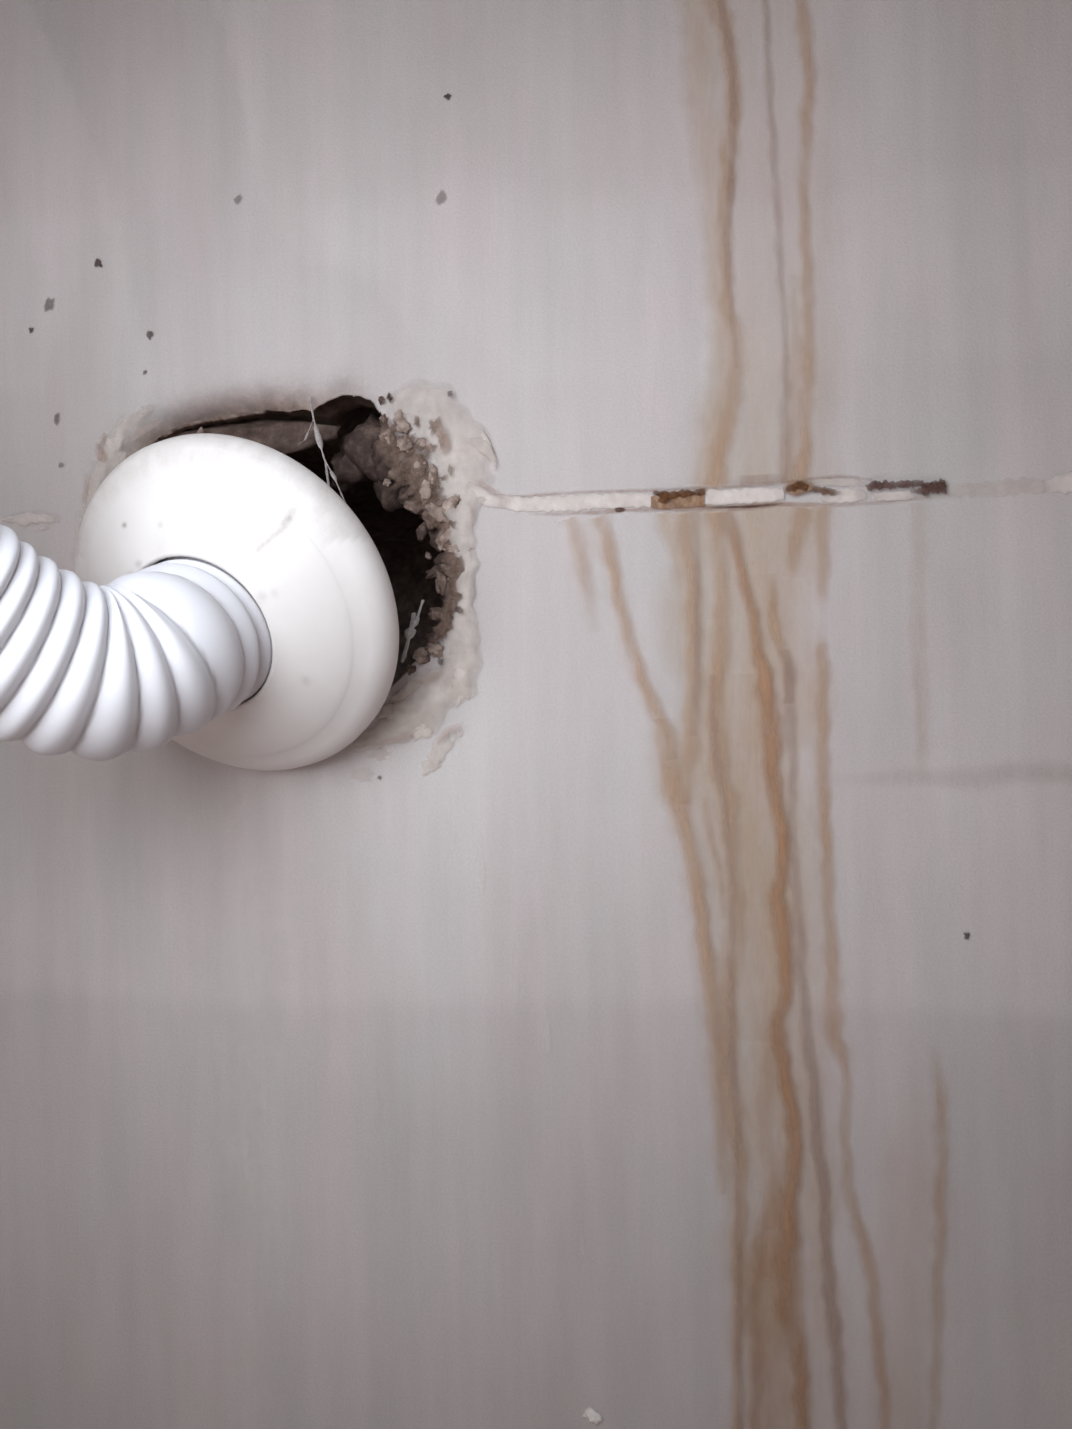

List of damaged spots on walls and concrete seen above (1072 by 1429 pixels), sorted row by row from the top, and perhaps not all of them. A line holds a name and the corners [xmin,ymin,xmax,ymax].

corrosion [717,0,738,123]
flaking render [87,419,135,502]
crack [485,478,947,514]
crack [1044,472,1072,494]
flaking render [179,392,501,773]
corrosion [738,556,831,1319]